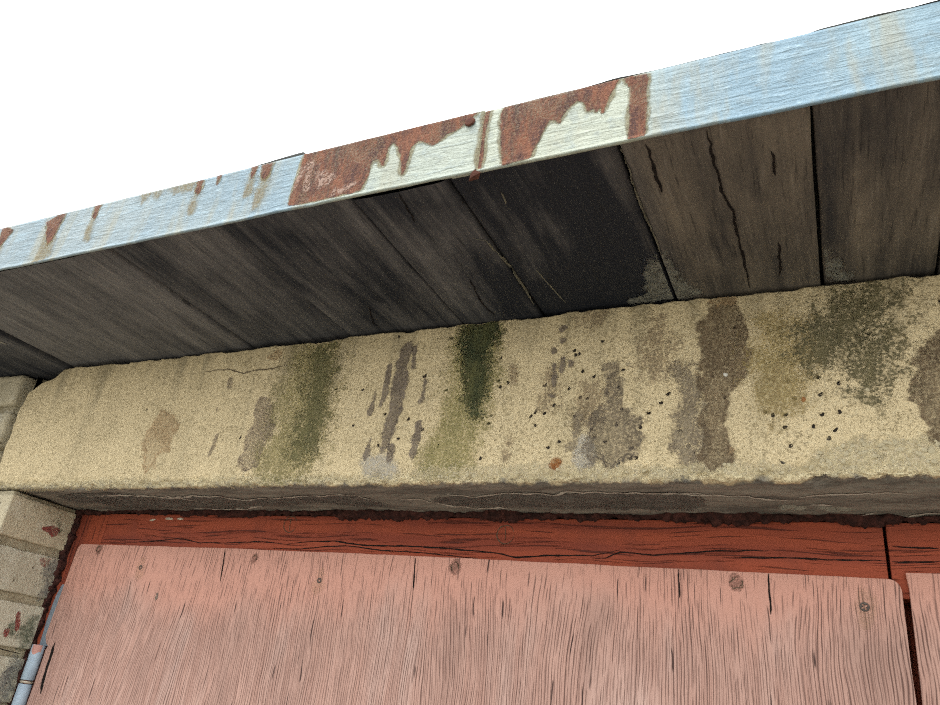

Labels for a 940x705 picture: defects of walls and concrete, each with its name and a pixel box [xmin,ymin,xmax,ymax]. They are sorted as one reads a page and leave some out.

corrosion [288,73,651,205]
crack [645,144,662,193]
crack [769,152,777,176]
crack [706,130,750,288]
corrosion [0,227,13,246]
corrosion [35,213,67,260]
crack [775,242,783,276]
damp [565,252,820,471]
damp [907,330,940,446]